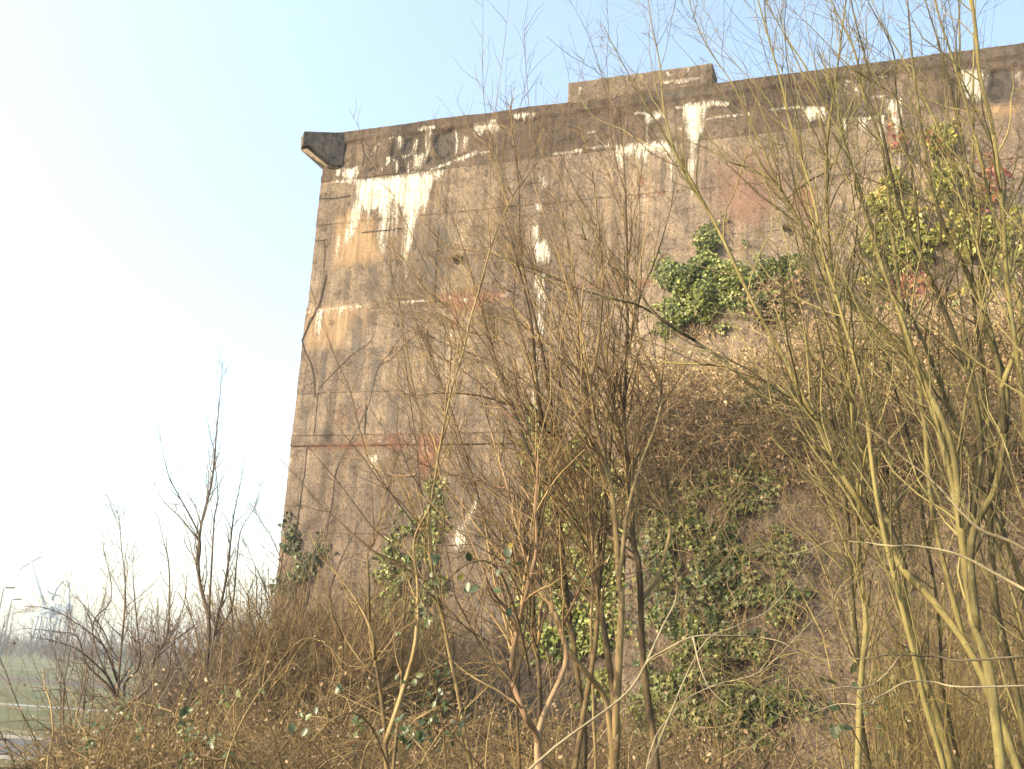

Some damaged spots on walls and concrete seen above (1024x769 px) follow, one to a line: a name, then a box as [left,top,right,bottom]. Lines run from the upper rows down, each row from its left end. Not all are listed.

damp [336,120,499,265]
damp [608,111,672,195]
damp [659,72,749,175]
damp [955,46,1015,100]
damp [533,226,549,360]